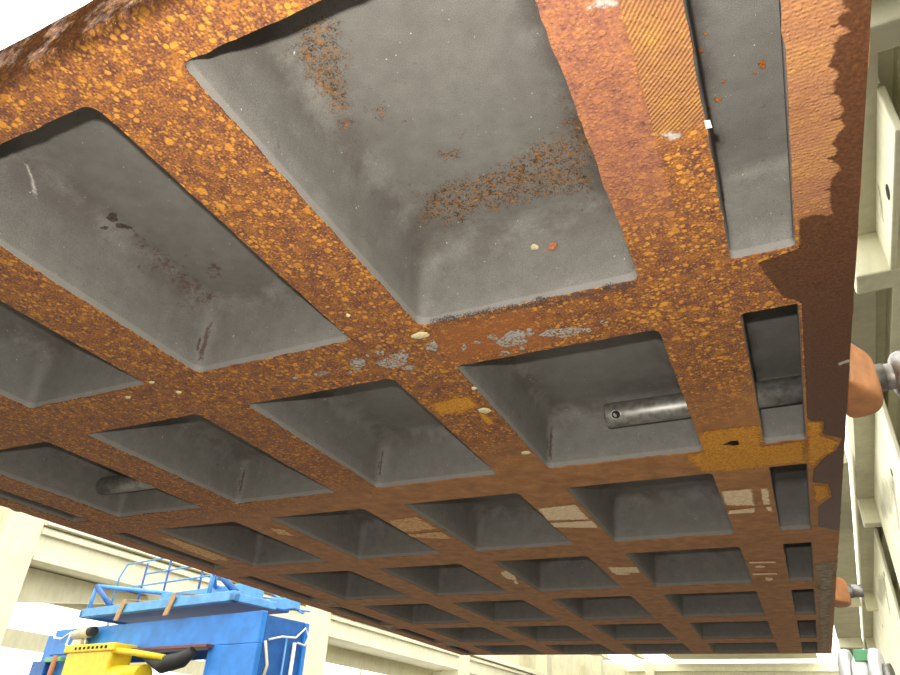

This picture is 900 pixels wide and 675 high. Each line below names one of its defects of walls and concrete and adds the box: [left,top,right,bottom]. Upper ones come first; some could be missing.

corrosion [297,17,347,110]
corrosion [422,113,592,227]
peeling [348,349,416,373]
peeling [461,327,592,356]
corrosion [686,422,838,472]
corrosion [813,485,829,502]